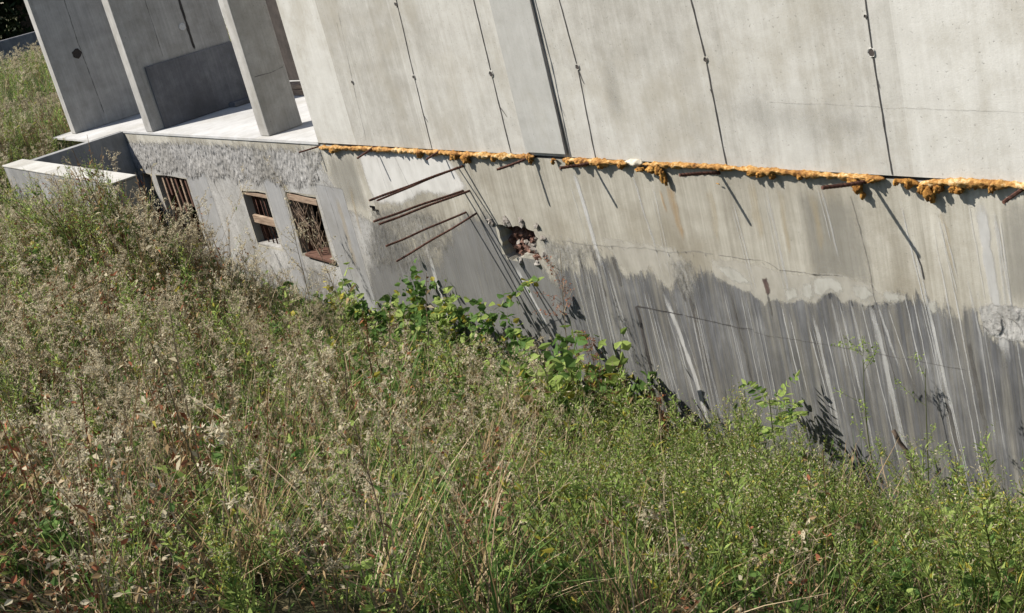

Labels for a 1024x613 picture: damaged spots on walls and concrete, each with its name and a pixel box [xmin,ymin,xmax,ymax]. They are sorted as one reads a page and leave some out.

spalling [368,165,594,276]
leakage [370,177,1024,523]
crack [635,203,895,378]
peeling [979,304,1024,342]